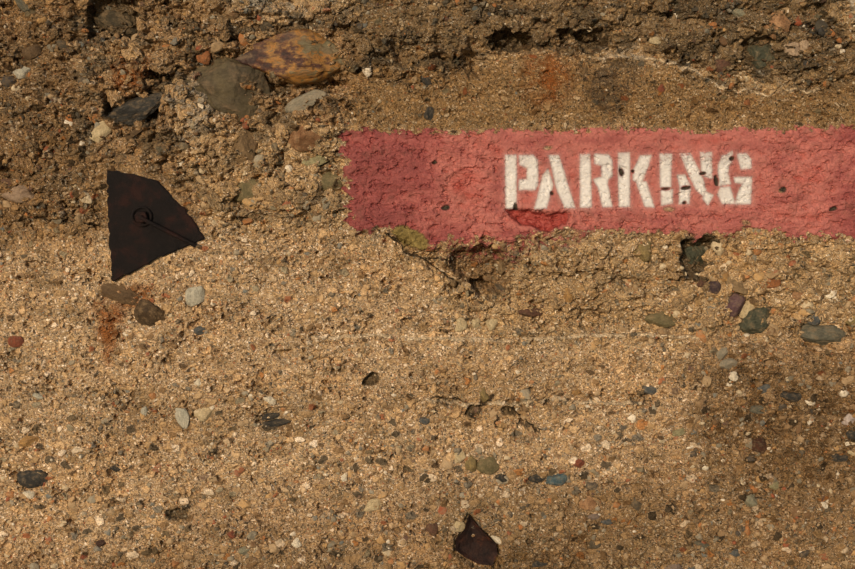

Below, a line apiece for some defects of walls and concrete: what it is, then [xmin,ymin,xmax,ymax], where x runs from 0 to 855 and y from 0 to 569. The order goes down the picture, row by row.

rust [97,288,149,362]